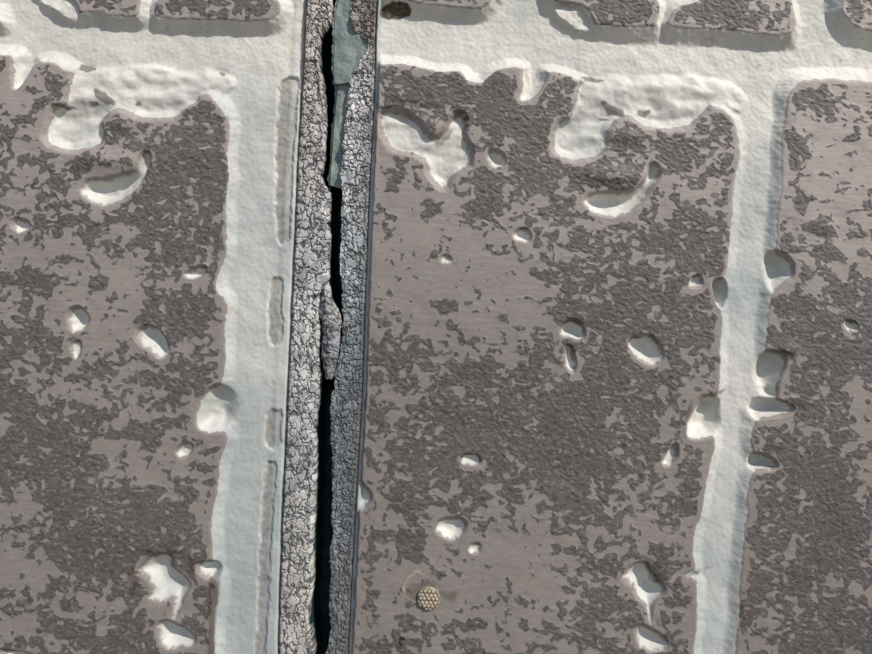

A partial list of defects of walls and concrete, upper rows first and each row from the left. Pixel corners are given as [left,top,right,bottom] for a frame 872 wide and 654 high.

spalling [76,149,154,211]
spalling [41,63,237,154]
spalling [376,106,509,191]
spalling [515,66,551,104]
spalling [580,159,663,221]
spalling [550,71,748,163]
spalling [132,323,173,364]
crack [279,0,377,654]
spalling [172,383,243,463]
spalling [658,394,723,470]
spalling [132,552,226,654]
spalling [618,559,672,654]